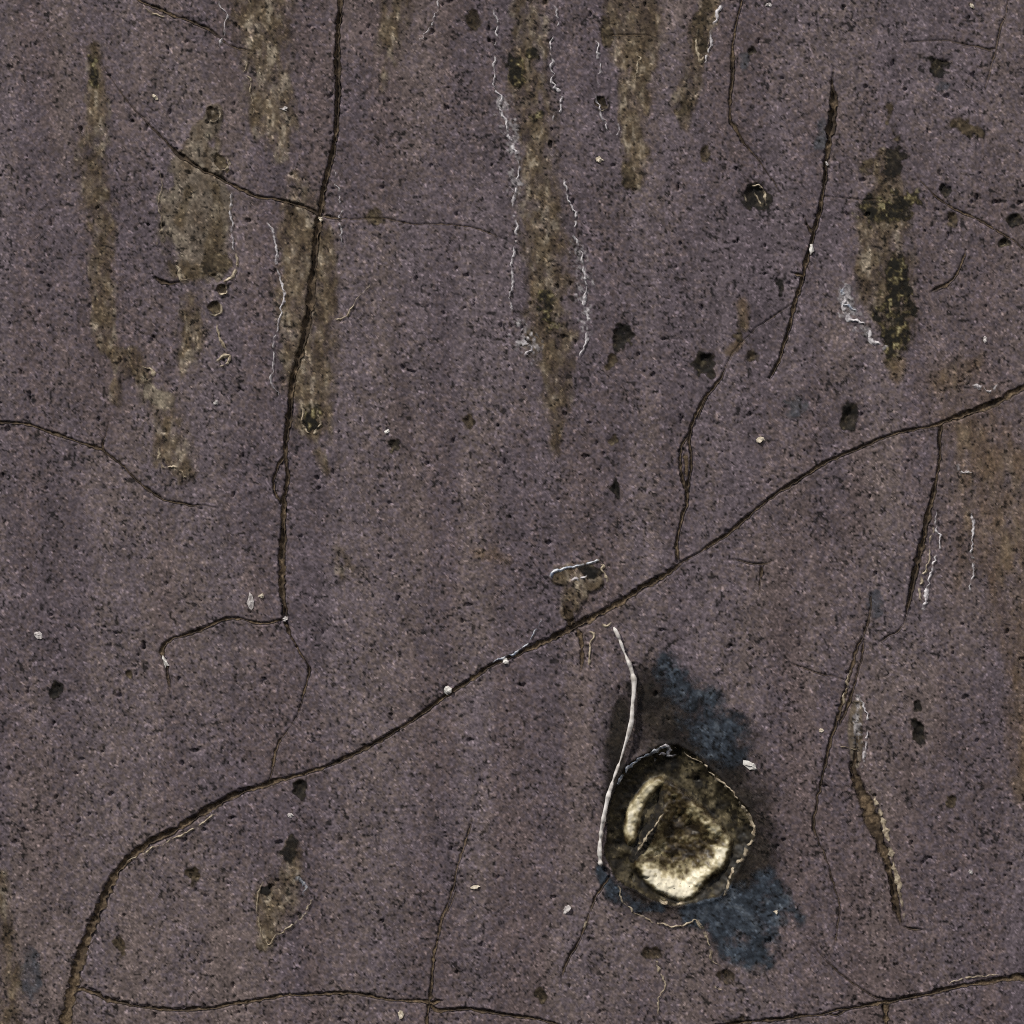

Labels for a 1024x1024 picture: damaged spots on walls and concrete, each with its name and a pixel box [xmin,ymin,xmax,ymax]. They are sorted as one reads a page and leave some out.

water stain [595,0,660,189]
crack [728,0,779,191]
water stain [492,0,591,452]
crack [770,75,838,377]
crack [921,181,1024,250]
water stain [179,296,202,371]
crack [119,0,347,718]
crack [0,421,203,506]
peeling [550,559,608,619]
crack [58,358,1024,1024]
spalling [604,744,756,928]
water stain [604,668,772,899]